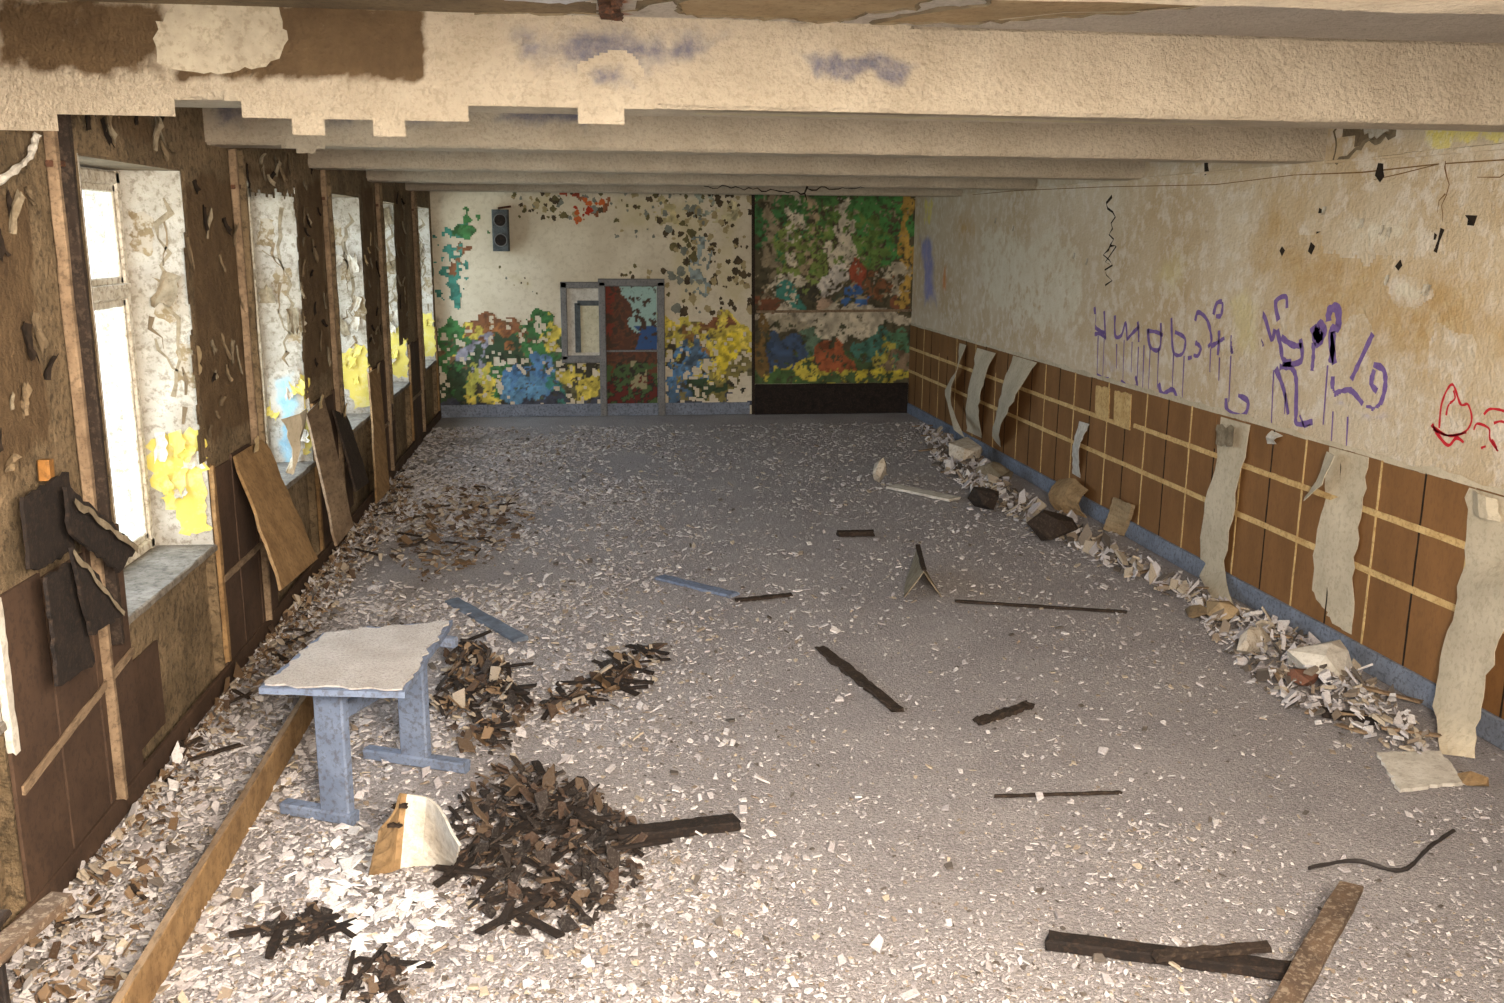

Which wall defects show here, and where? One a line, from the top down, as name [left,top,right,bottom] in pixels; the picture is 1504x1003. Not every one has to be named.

peeling [153,4,288,74]
corrosion [585,0,645,22]
spalling [621,0,1196,25]
spalling [1332,129,1396,165]
peeling [508,192,756,321]
peeling [1299,163,1444,309]
peeling [0,164,60,516]